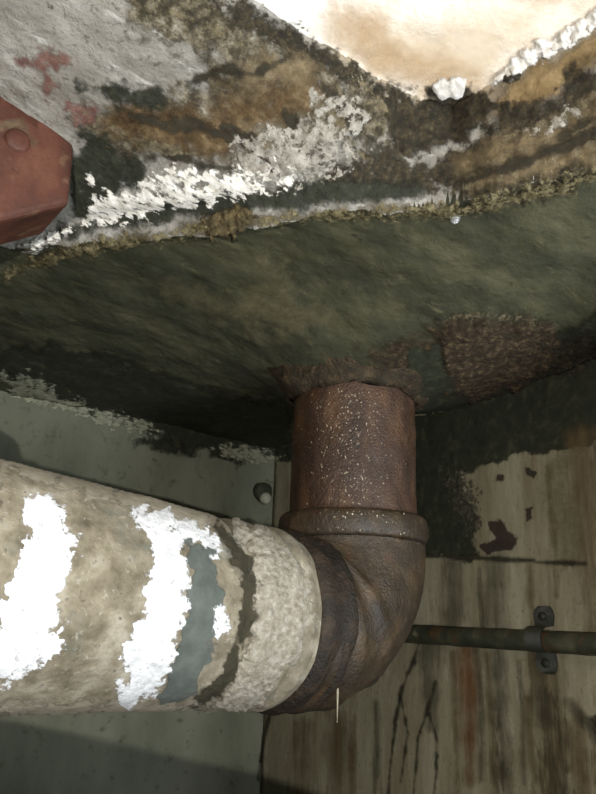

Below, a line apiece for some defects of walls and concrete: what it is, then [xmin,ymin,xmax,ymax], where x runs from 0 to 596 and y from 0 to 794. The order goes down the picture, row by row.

water stain [4,0,596,282]
water stain [406,344,596,568]
crack [387,644,439,794]